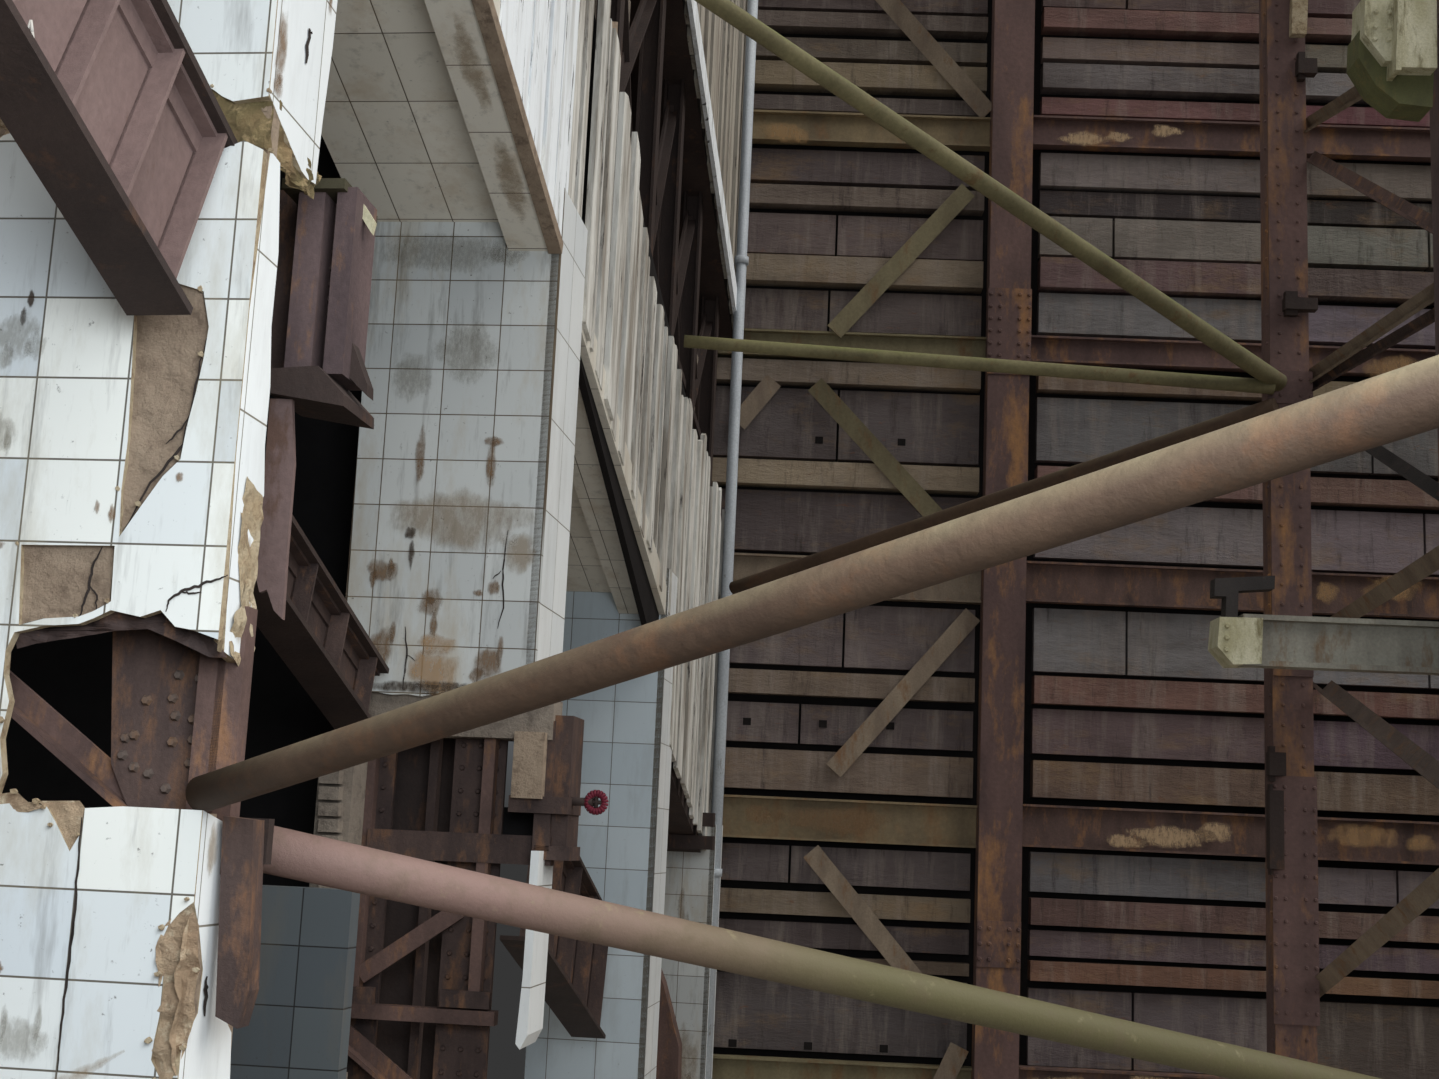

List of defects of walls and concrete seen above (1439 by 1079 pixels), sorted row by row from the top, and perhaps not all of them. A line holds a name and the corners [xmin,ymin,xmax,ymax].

spalling [210,84,322,199]
spalling [115,285,209,530]
spalling [15,477,264,666]
spalling [0,789,85,850]
spalling [144,897,200,1079]